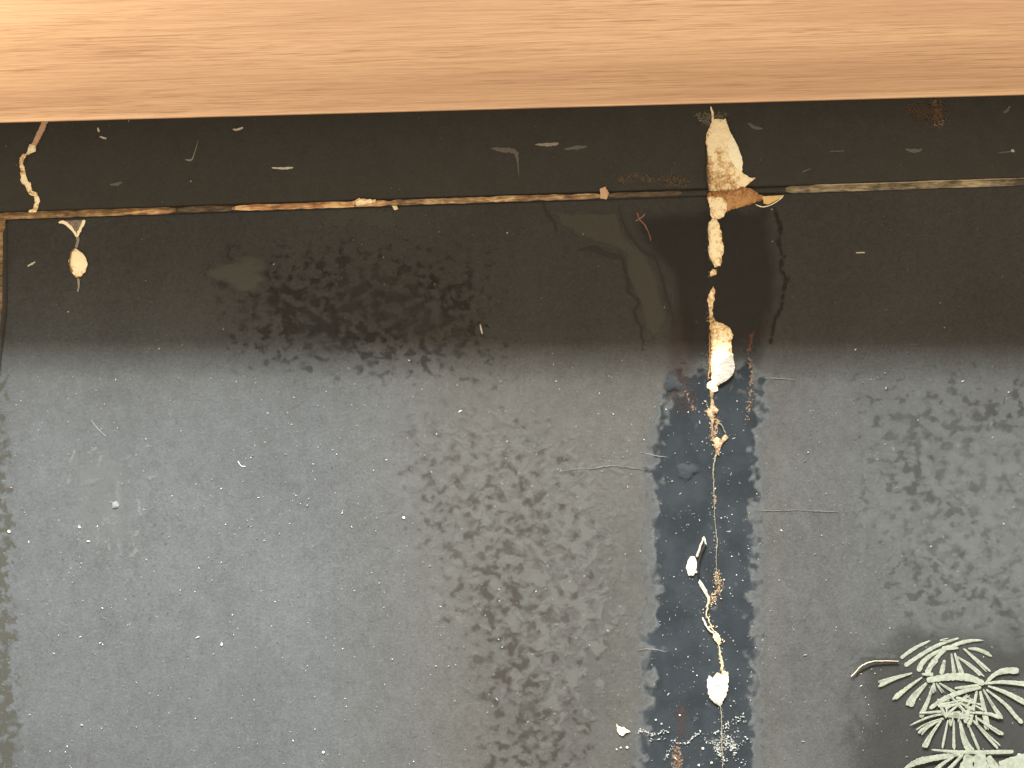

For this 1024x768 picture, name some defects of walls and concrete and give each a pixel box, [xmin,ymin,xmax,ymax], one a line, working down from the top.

crack [19,122,48,213]
peeling [705,106,784,219]
peeling [59,220,88,292]
water stain [454,455,530,506]
crack [616,218,748,768]
water stain [634,358,770,768]
water stain [458,562,572,720]
water stain [485,730,585,768]